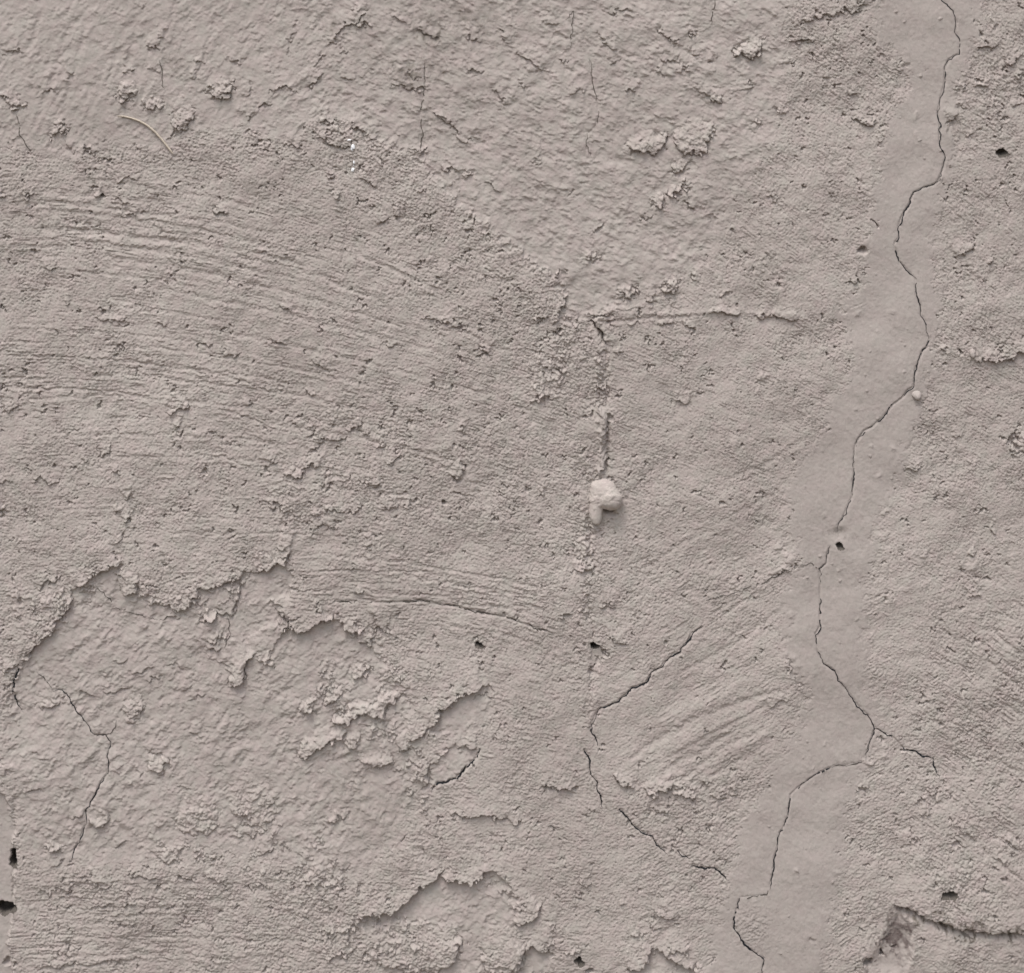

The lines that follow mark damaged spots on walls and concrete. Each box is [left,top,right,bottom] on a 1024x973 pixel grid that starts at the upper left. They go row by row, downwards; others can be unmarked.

crack [584,0,960,971]
crack [12,668,117,860]
spalling [0,558,417,888]
spalling [422,684,496,741]